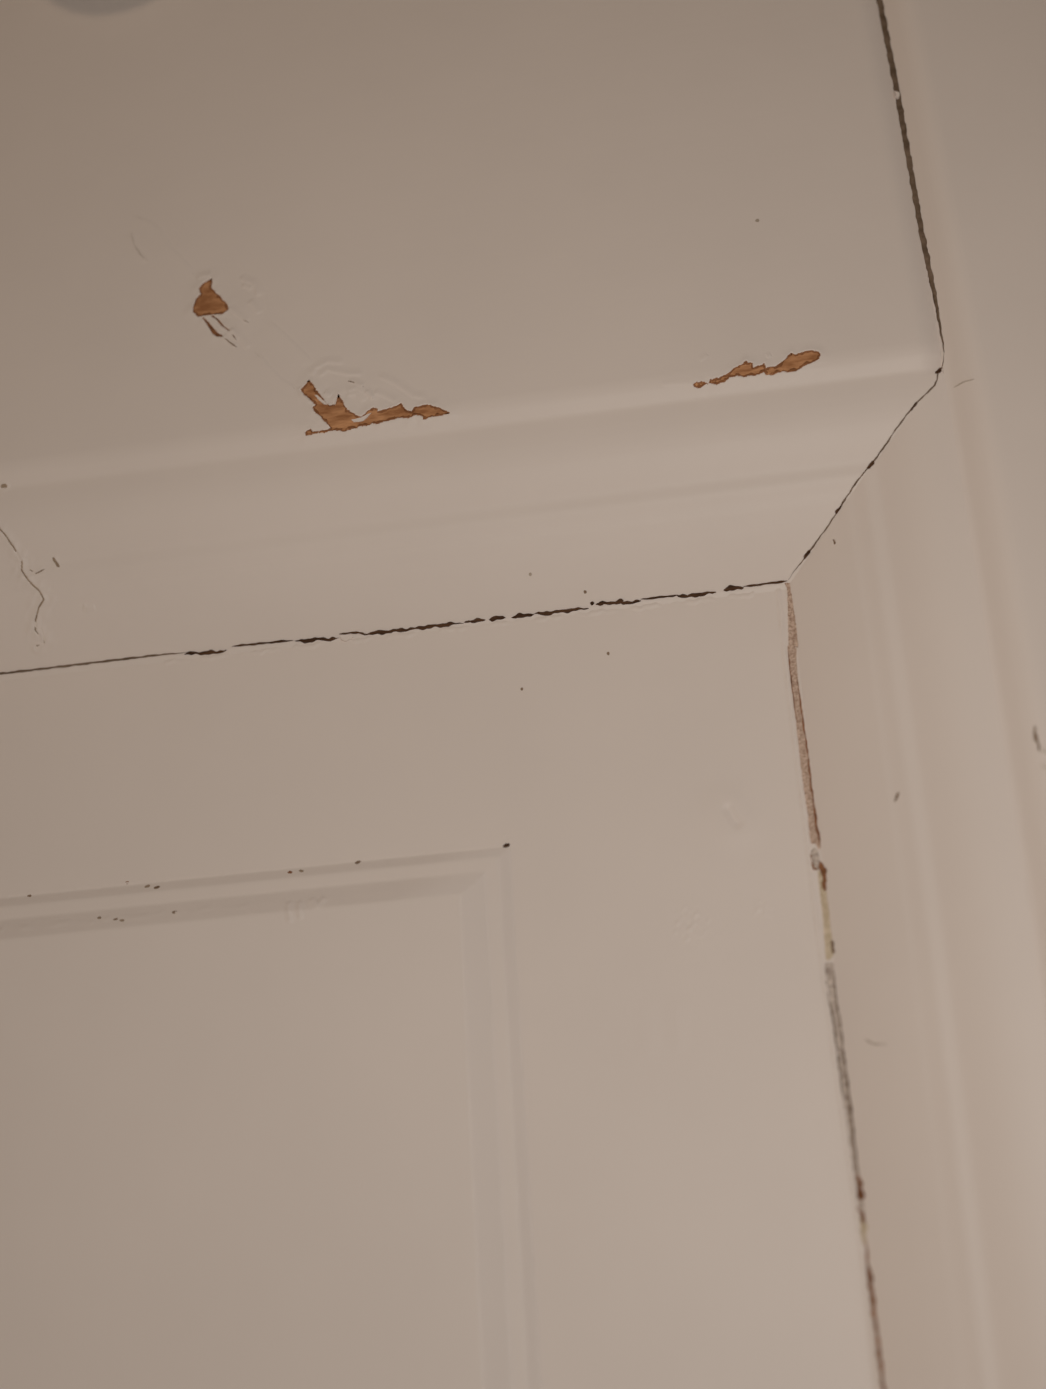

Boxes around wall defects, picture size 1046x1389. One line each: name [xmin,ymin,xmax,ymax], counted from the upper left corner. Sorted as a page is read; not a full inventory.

peeling [180,266,268,351]
peeling [287,355,463,448]
peeling [660,341,832,397]
crack [0,514,717,675]
crack [724,0,944,1389]